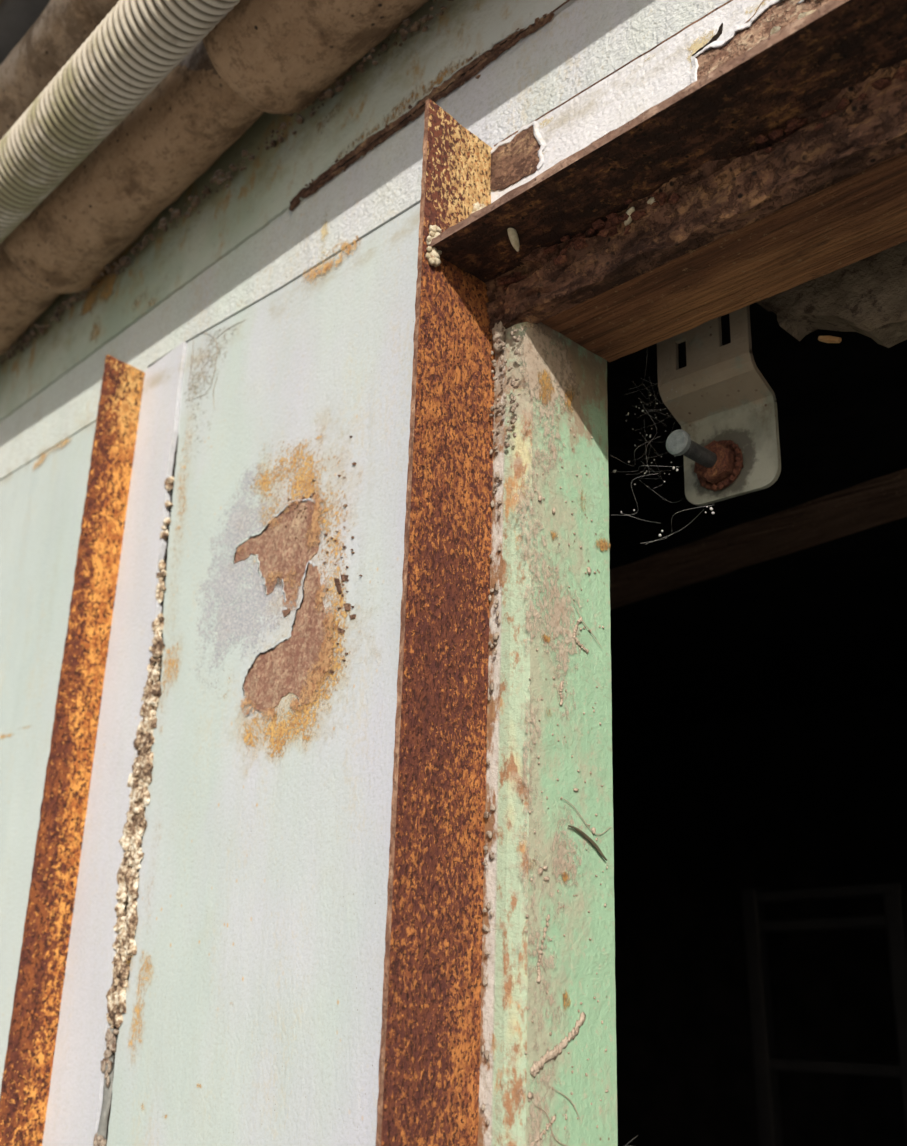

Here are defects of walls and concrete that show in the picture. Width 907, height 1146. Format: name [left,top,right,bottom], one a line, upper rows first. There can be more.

peeling [288,9,556,213]
rust [289,11,555,211]
rust [490,0,733,191]
peeling [687,0,831,83]
peeling [197,434,362,758]